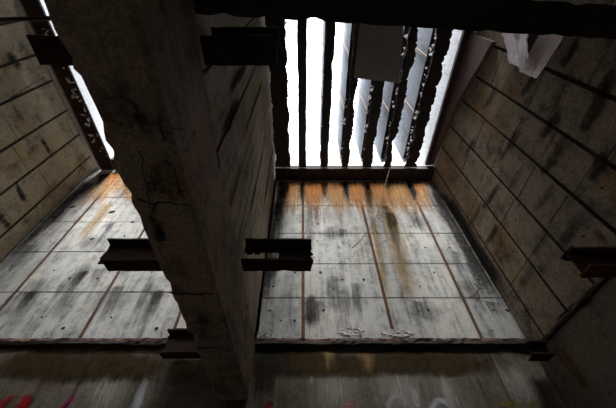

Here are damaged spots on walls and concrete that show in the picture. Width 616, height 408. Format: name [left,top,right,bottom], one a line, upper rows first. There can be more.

damp [581,74,614,130]
corrosion [86,173,131,235]
crack [138,151,189,276]
corrosion [282,181,430,286]
damp [63,267,98,304]
damp [141,285,164,316]
damp [305,295,319,325]